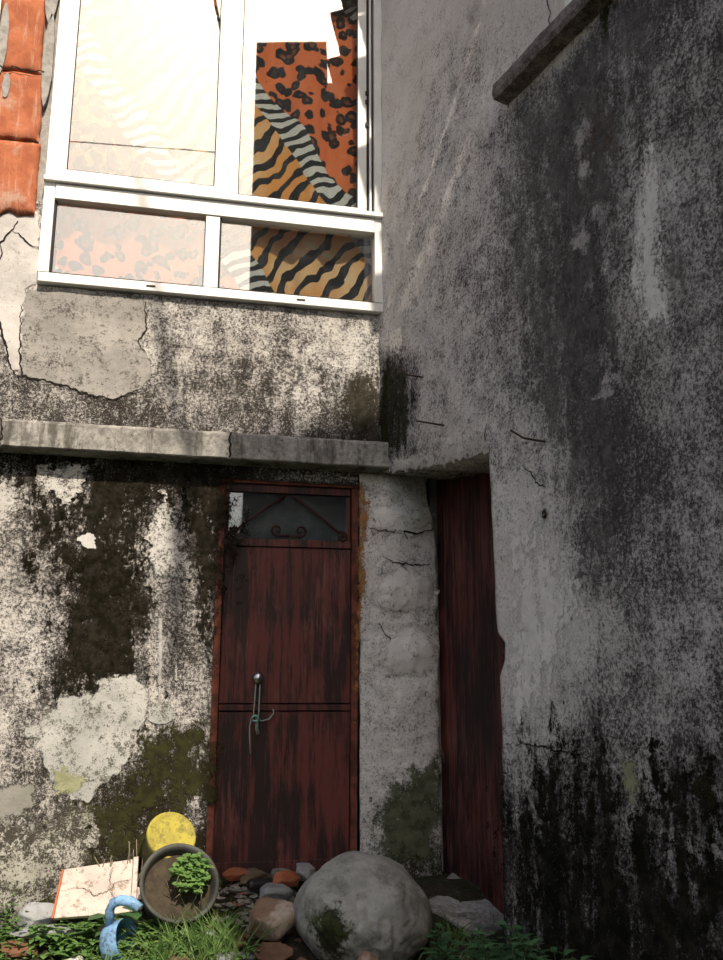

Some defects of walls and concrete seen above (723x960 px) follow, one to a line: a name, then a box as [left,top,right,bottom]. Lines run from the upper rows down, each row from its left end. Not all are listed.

crack [0,221,36,259]
peeling [0,211,151,400]
water stain [488,0,698,597]
water stain [333,351,419,464]
peeling [0,472,20,534]
water stain [0,453,261,709]
spalling [24,674,174,803]
water stain [478,686,723,960]